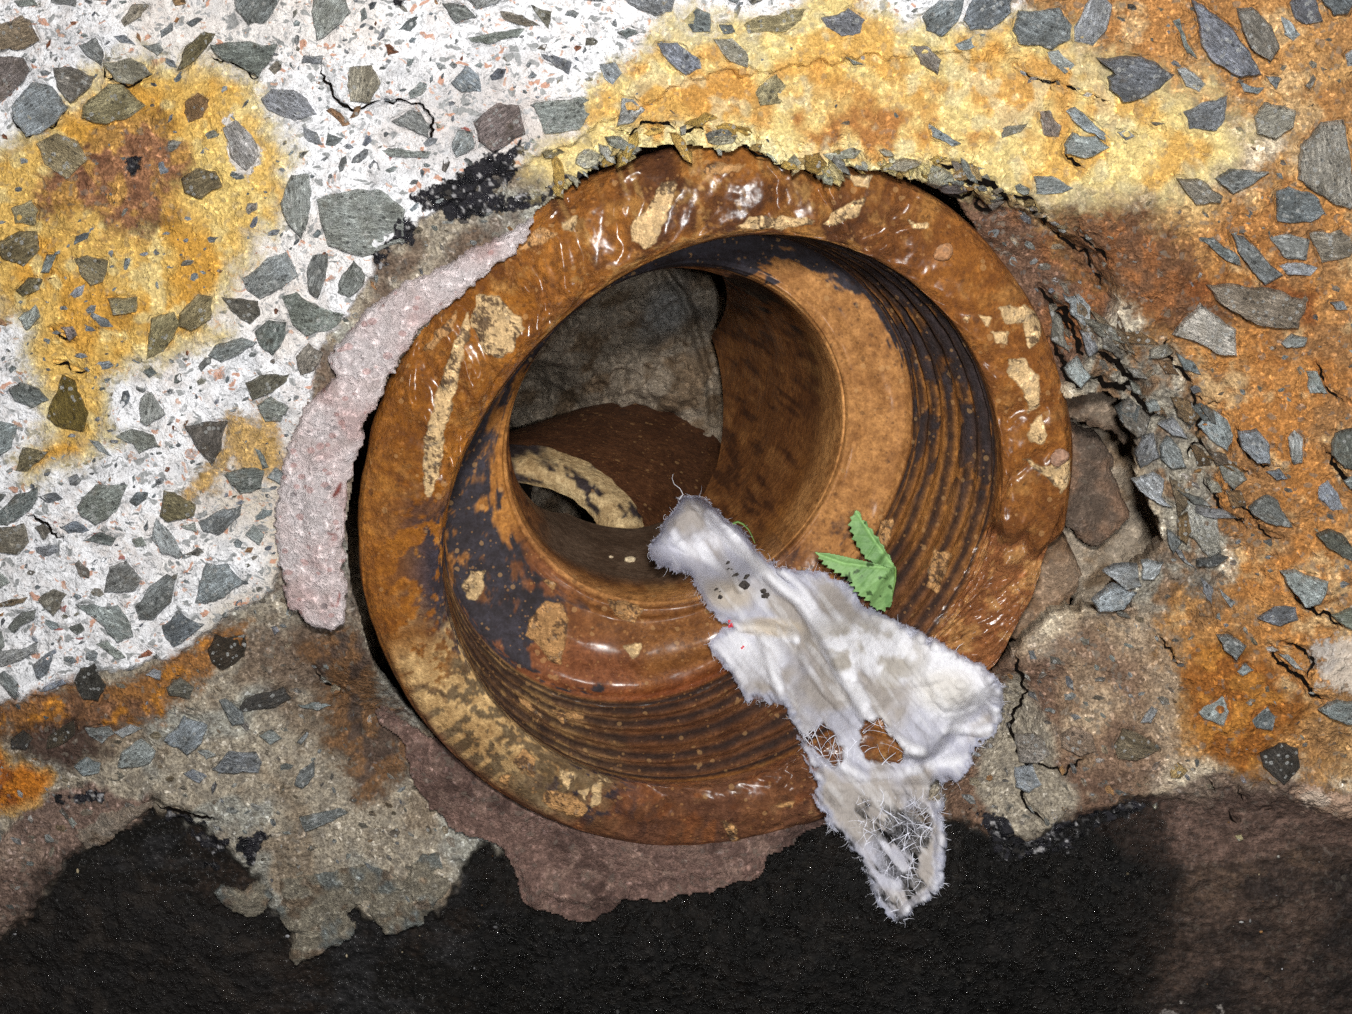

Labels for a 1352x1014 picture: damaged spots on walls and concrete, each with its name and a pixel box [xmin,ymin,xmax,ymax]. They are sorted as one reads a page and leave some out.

corrosion [0,58,295,486]
corrosion [524,0,1352,788]
peeling [1026,459,1071,494]
spalling [963,292,1217,444]
spalling [1169,444,1247,568]
corrosion [0,629,243,817]
corrosion [298,626,410,804]
water stain [1290,781,1352,819]
water stain [0,881,281,1014]
water stain [431,800,1182,1014]